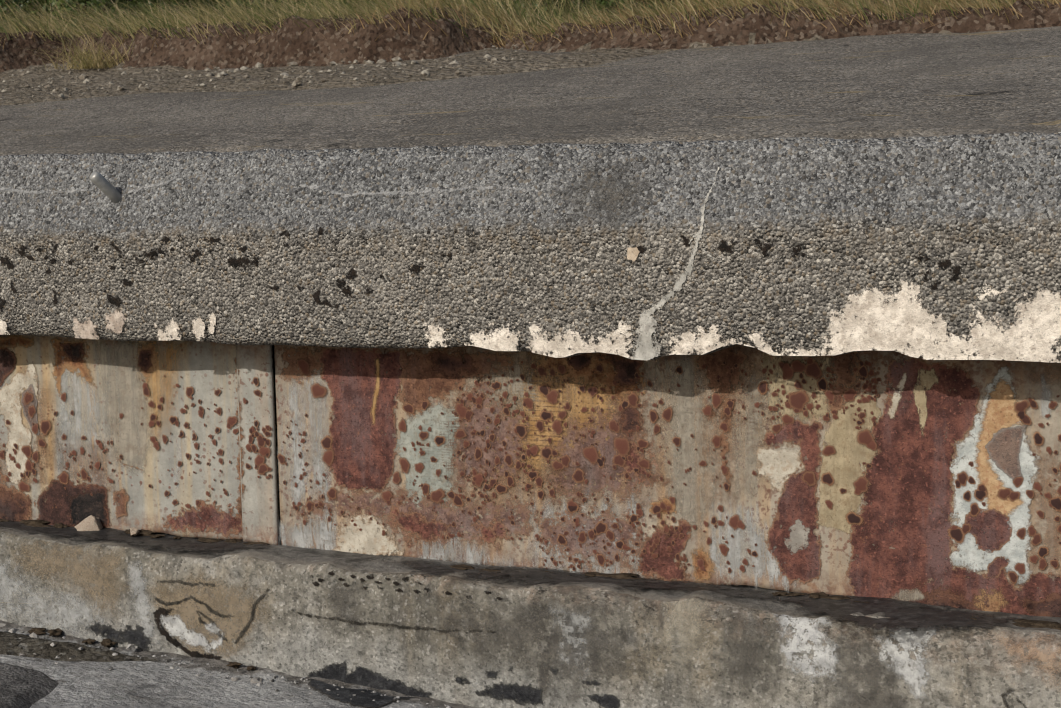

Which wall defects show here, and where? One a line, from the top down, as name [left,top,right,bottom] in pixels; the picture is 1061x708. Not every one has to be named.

water stain [423,316,451,348]
water stain [464,315,634,359]
water stain [666,280,1061,363]
rust [0,335,129,528]
peeling [1042,389,1050,416]
rust [132,341,1061,617]
peeling [949,366,1041,587]
crack [1001,688,1025,708]